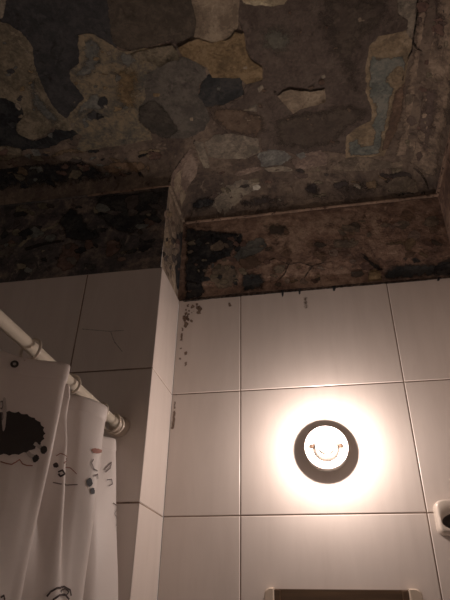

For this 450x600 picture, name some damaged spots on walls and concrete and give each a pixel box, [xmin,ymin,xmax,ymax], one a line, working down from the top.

peeling [0,0,402,217]
peeling [345,0,417,158]
water stain [175,227,243,366]
water stain [385,258,450,279]